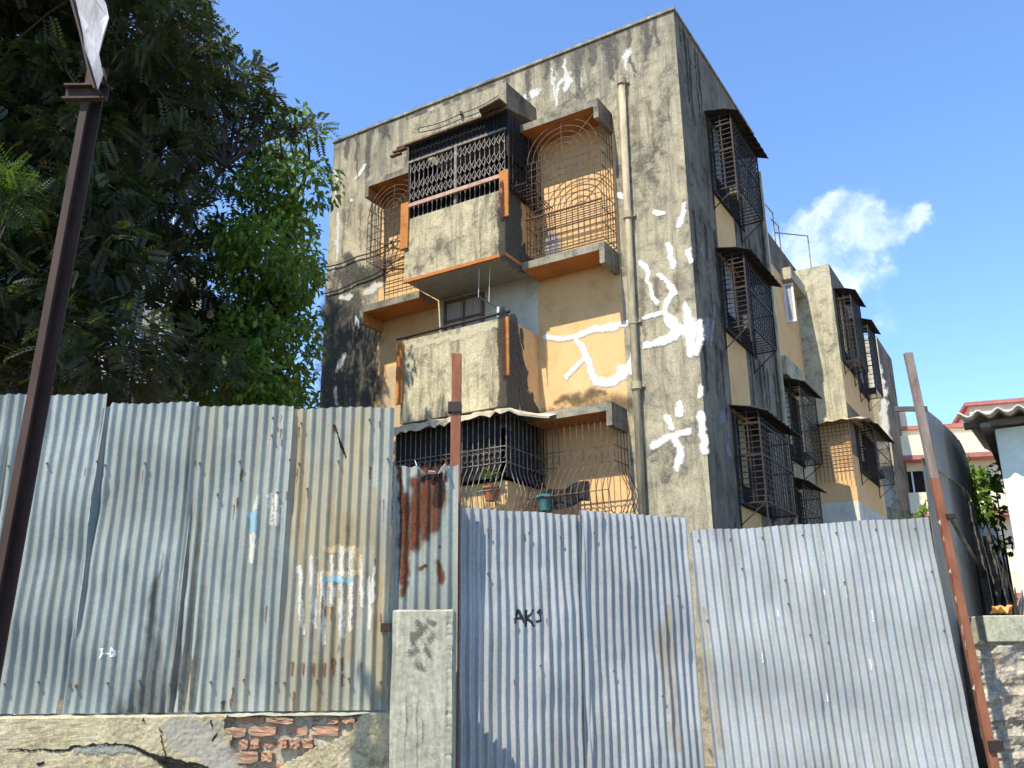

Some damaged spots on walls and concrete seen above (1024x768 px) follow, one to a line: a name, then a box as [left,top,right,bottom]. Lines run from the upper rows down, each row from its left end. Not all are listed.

damp [523,18,660,106]
damp [679,27,703,135]
damp [343,122,390,177]
damp [314,170,397,408]
damp [693,211,732,457]
rust [397,461,447,596]
crack [6,718,209,768]
spalling [224,716,360,768]